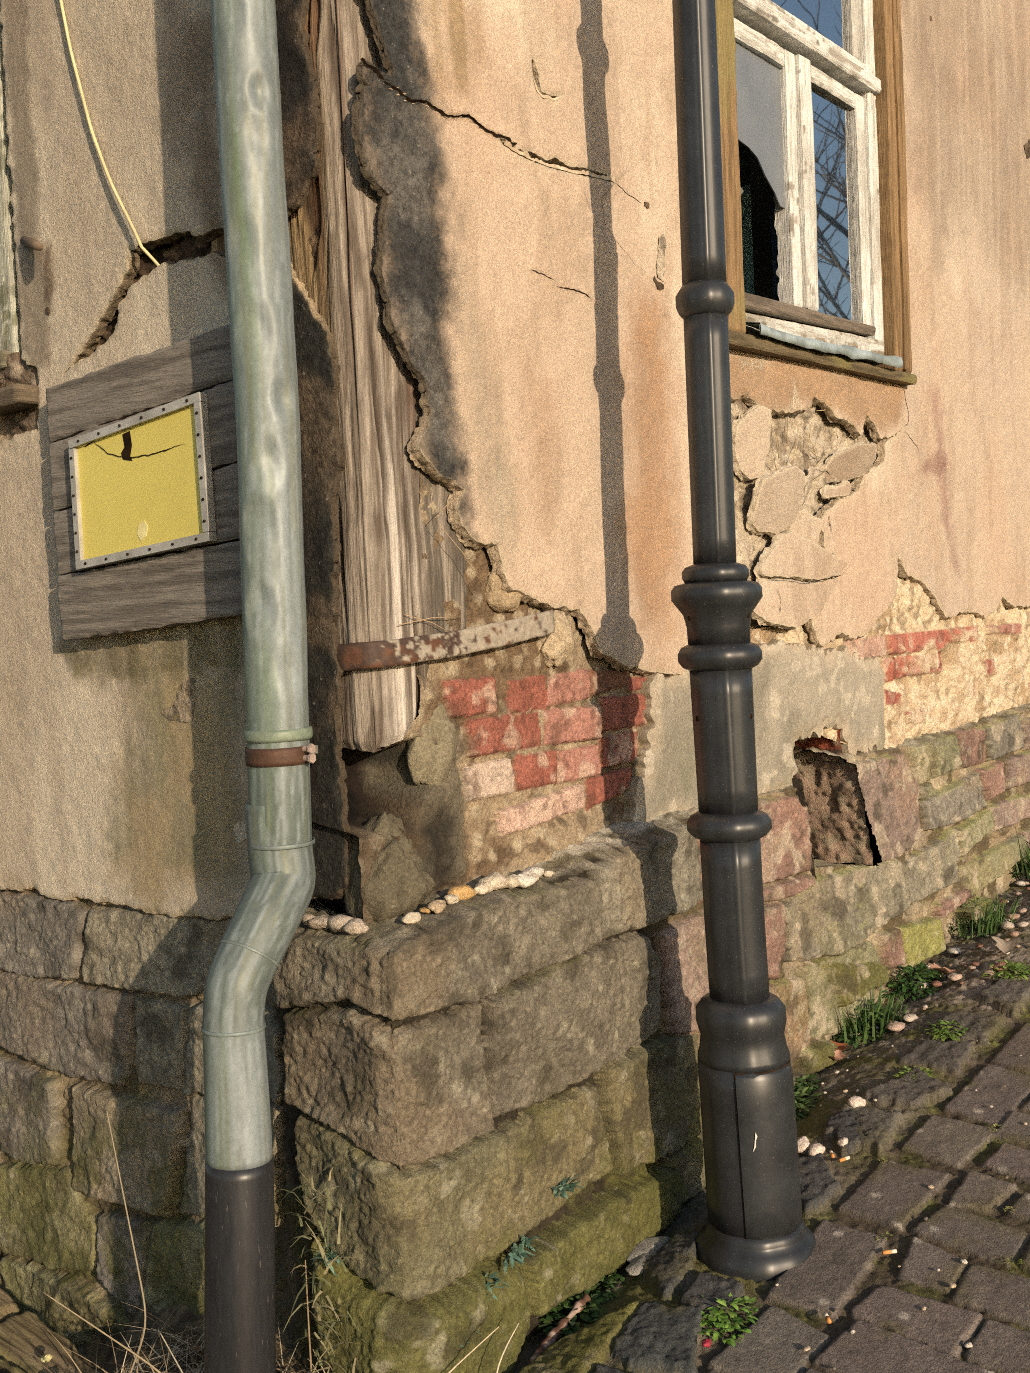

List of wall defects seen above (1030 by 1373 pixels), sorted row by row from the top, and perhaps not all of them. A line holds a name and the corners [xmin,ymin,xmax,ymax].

crack [24,228,225,373]
water stain [275,0,316,208]
crack [308,222,321,271]
water stain [361,0,468,480]
crack [360,57,644,270]
flaking render [287,0,681,925]
flaking render [731,393,1030,749]